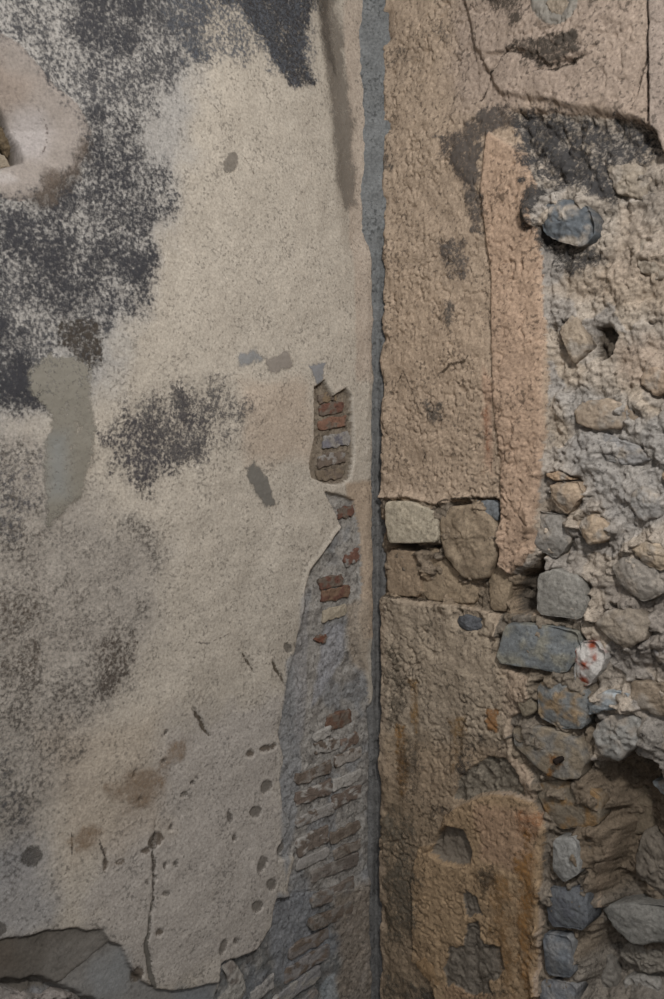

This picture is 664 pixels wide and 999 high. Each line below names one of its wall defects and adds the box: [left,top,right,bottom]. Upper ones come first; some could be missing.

spalling [0,33,91,201]
leakage [431,98,664,280]
leakage [97,373,253,500]
spalling [379,112,664,999]
flaking render [215,380,372,999]
flaking render [21,845,43,866]
flaking render [0,982,80,999]
flaking render [130,967,144,982]
crack [144,834,156,988]
flaking render [142,824,172,854]